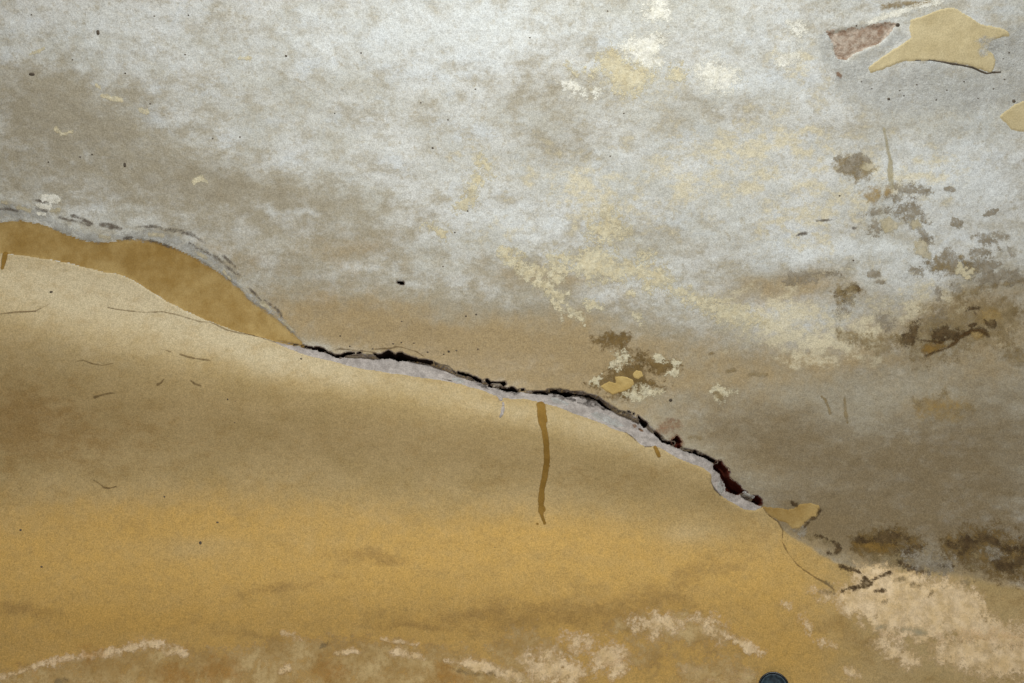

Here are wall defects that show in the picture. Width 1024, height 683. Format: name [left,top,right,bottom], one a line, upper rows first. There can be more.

peeling [821,0,1010,77]
peeling [1000,101,1024,132]
water stain [782,128,1024,366]
peeling [0,194,821,539]
crack [243,333,834,590]
water stain [584,331,683,403]